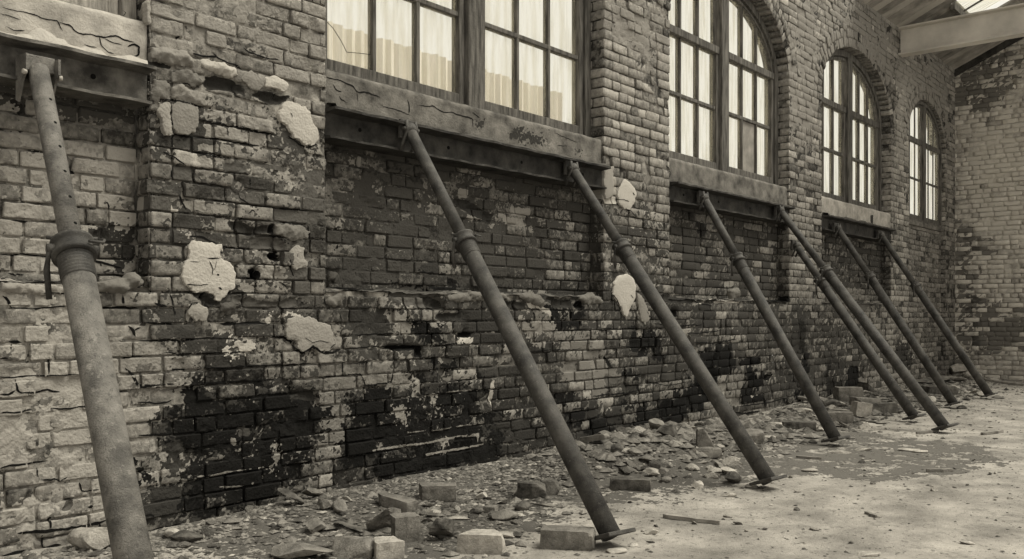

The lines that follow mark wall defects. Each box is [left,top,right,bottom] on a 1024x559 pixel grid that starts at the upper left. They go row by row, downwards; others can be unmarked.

crack [3,7,140,57]
spalling [203,75,290,105]
crack [327,77,480,121]
spalling [189,292,219,306]
water stain [108,249,586,559]
water stain [509,278,759,518]
water stain [668,299,1009,482]